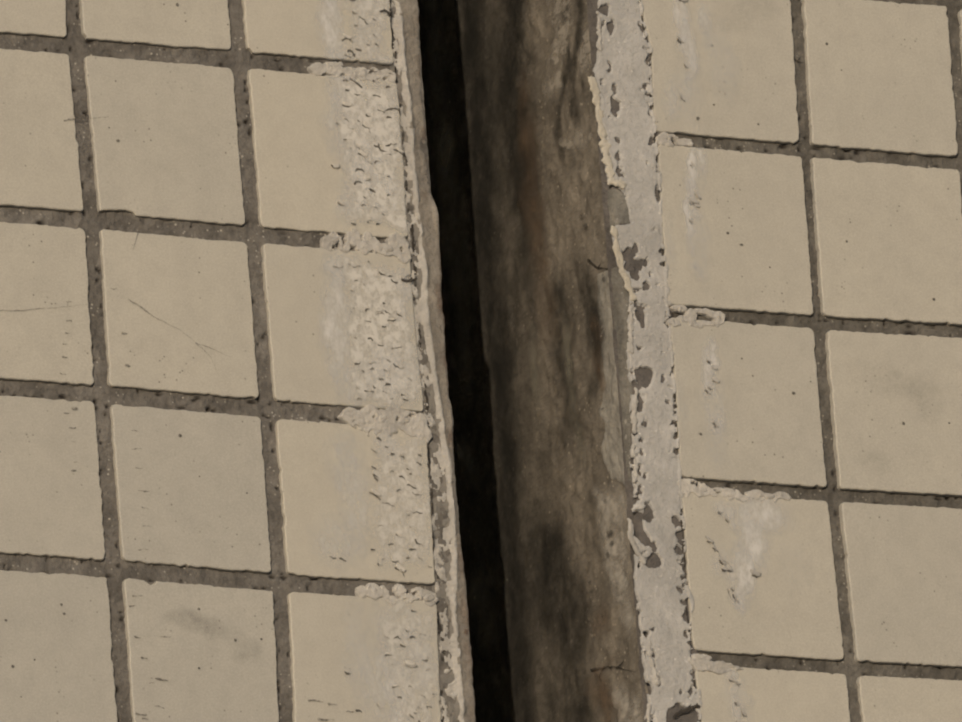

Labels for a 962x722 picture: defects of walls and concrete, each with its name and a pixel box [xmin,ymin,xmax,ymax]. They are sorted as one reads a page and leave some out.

peeling [545,0,573,96]
crack [380,0,438,578]
crack [587,259,620,274]
peeling [331,0,465,722]
peeling [559,0,702,722]
crack [437,611,445,661]
crack [590,661,629,681]